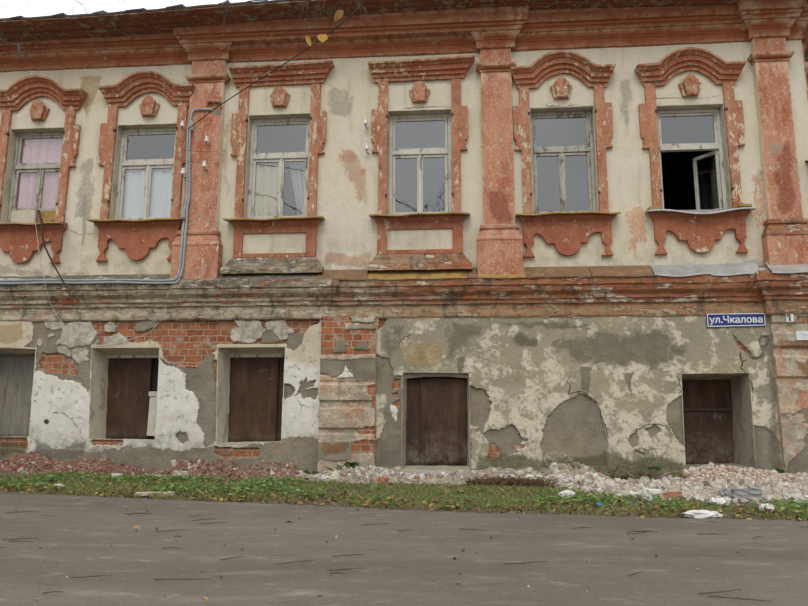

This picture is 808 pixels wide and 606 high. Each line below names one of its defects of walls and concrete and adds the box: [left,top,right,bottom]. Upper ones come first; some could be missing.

flaking render [24,316,402,469]
peeling [470,386,528,471]
peeling [540,394,609,469]
peeling [628,395,684,459]
peeling [754,389,808,474]